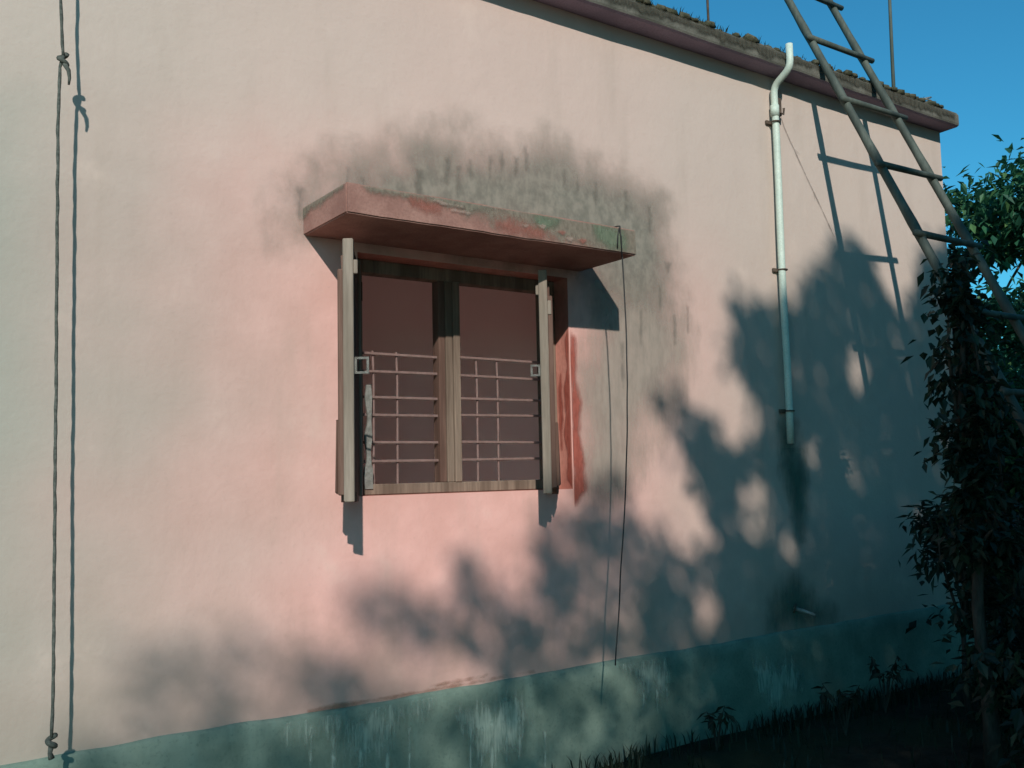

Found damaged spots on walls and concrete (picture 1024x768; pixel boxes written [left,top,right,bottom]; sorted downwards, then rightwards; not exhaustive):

water stain [345,142,682,494]
rust [559,334,586,503]